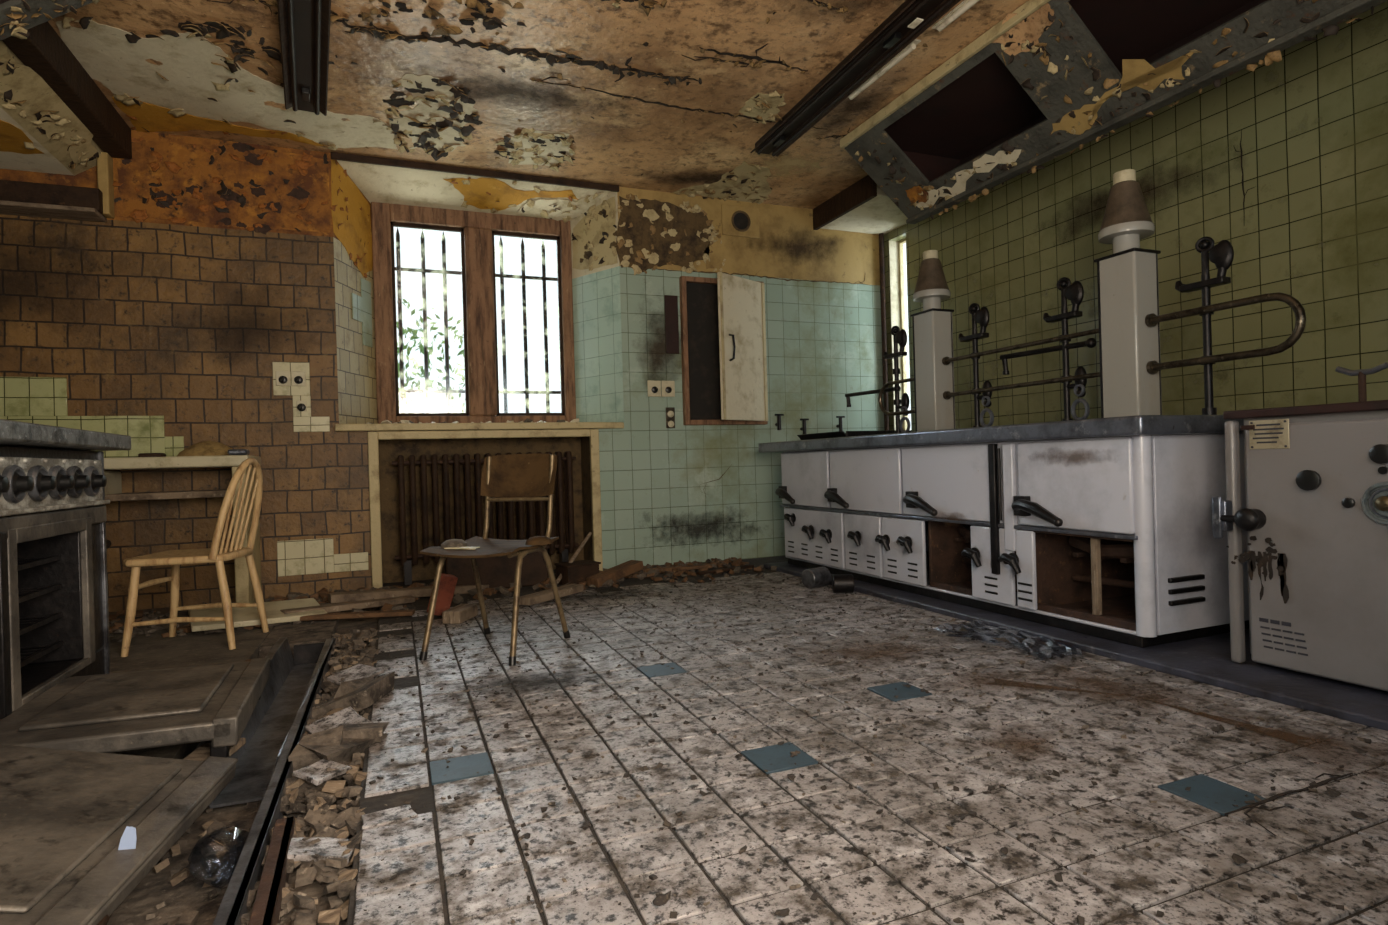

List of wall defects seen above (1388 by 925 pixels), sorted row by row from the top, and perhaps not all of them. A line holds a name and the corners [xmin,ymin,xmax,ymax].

peeling [345,0,527,36]
crack [330,10,808,123]
peeling [992,3,1282,154]
peeling [0,0,483,348]
peeling [444,103,800,275]
peeling [855,141,1045,219]
water stain [663,517,753,543]
spalling [327,664,384,685]
spalling [304,707,374,734]
spalling [293,759,352,786]
spalling [361,804,418,829]
spalling [287,837,354,863]